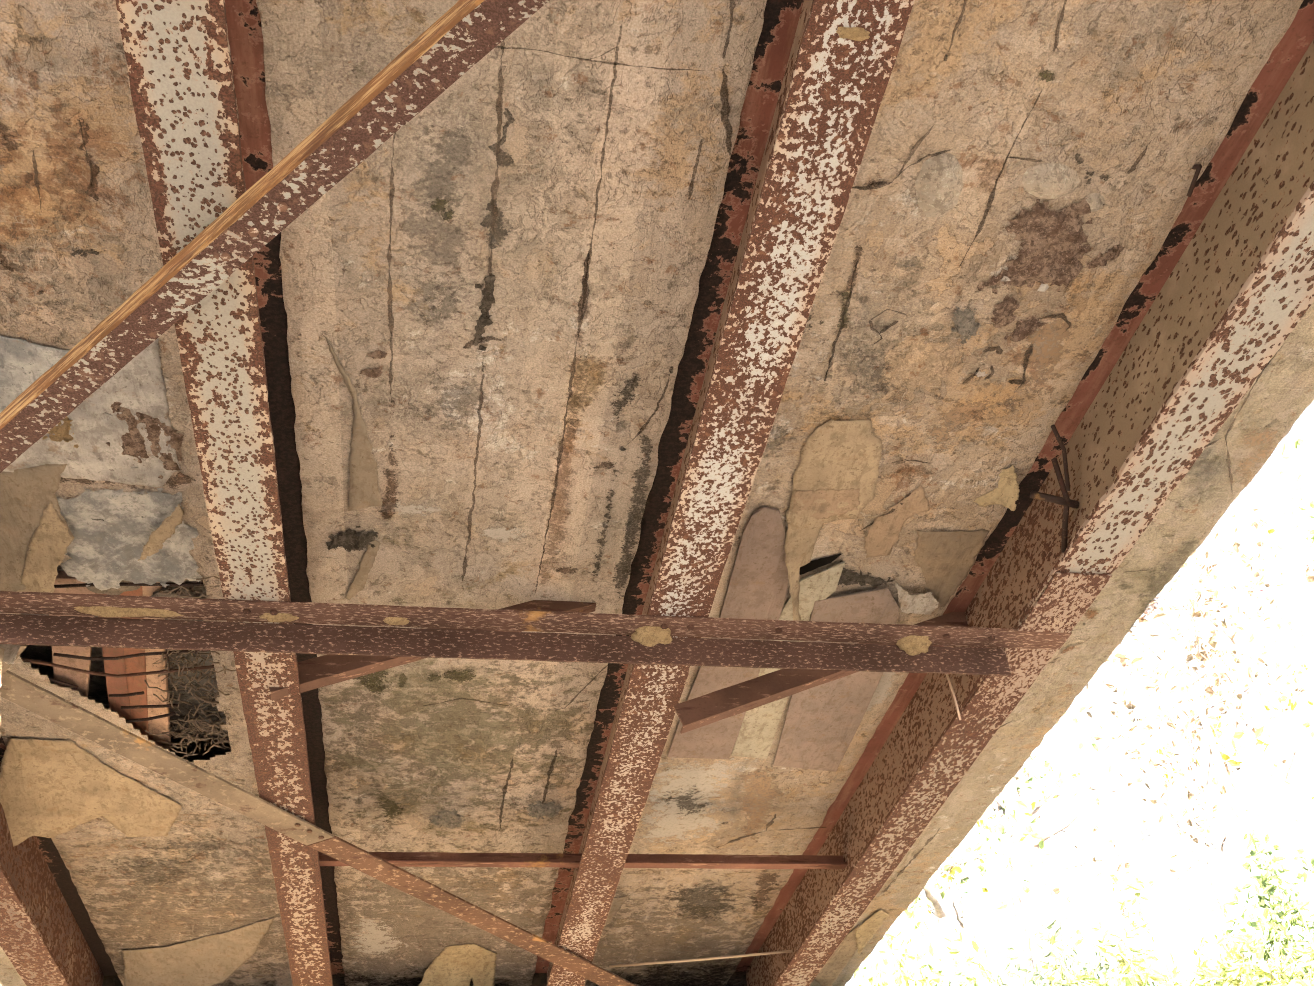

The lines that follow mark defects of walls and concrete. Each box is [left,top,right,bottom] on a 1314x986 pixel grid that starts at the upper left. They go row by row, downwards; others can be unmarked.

rust [57,117,100,201]
crack [960,70,1055,266]
crack [461,0,735,593]
peeling [0,335,204,593]
rust [60,478,145,489]
rust [166,475,196,489]
peeling [784,419,989,621]
rust [892,400,986,476]
rust [1132,595,1162,632]
spalling [0,644,214,723]
peeling [0,715,182,847]
peeling [121,917,275,986]